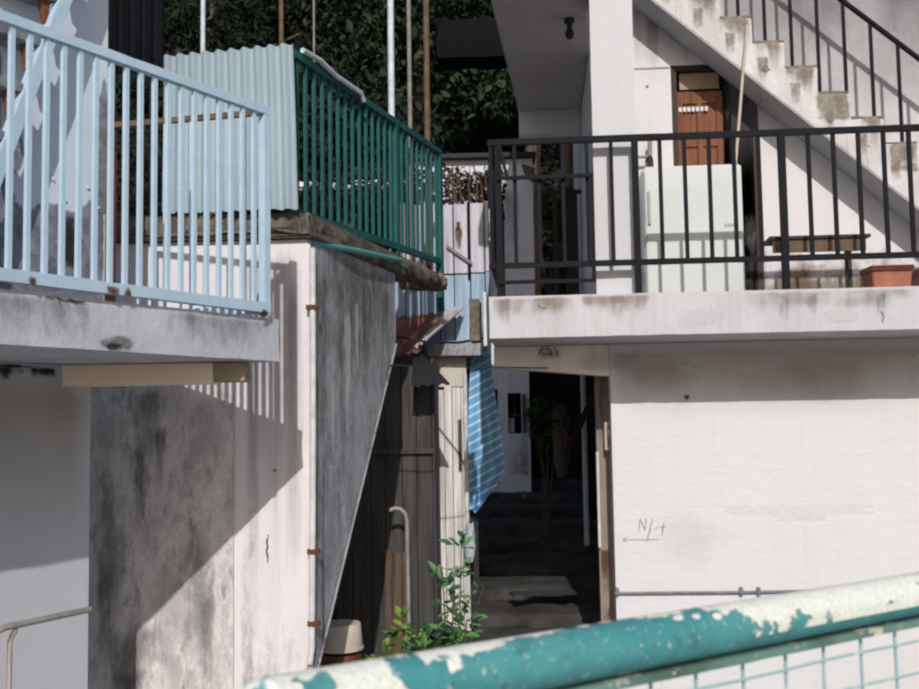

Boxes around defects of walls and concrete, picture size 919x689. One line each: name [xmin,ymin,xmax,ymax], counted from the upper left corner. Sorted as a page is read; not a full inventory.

water stain [725,0,919,51]
corrosion [107,286,131,296]
spalling [101,336,131,349]
mould [0,364,55,378]
peeling [261,572,919,689]